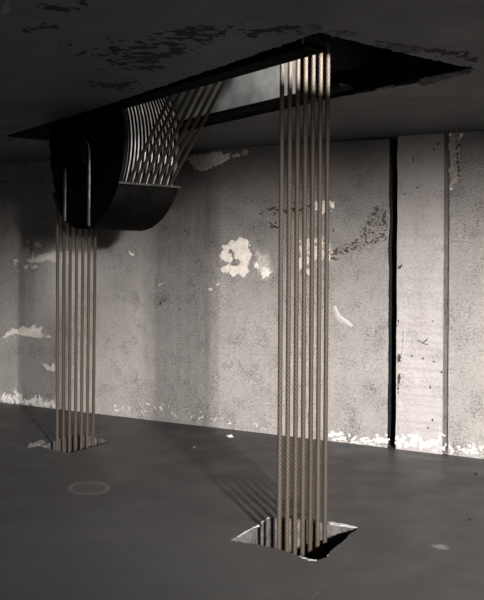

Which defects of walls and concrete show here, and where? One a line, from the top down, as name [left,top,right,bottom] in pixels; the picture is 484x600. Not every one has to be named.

peeling [186,151,240,171]
spalling [448,132,463,190]
peeling [13,240,69,270]
peeling [219,236,271,279]
spalling [299,202,388,275]
peeling [2,325,51,338]